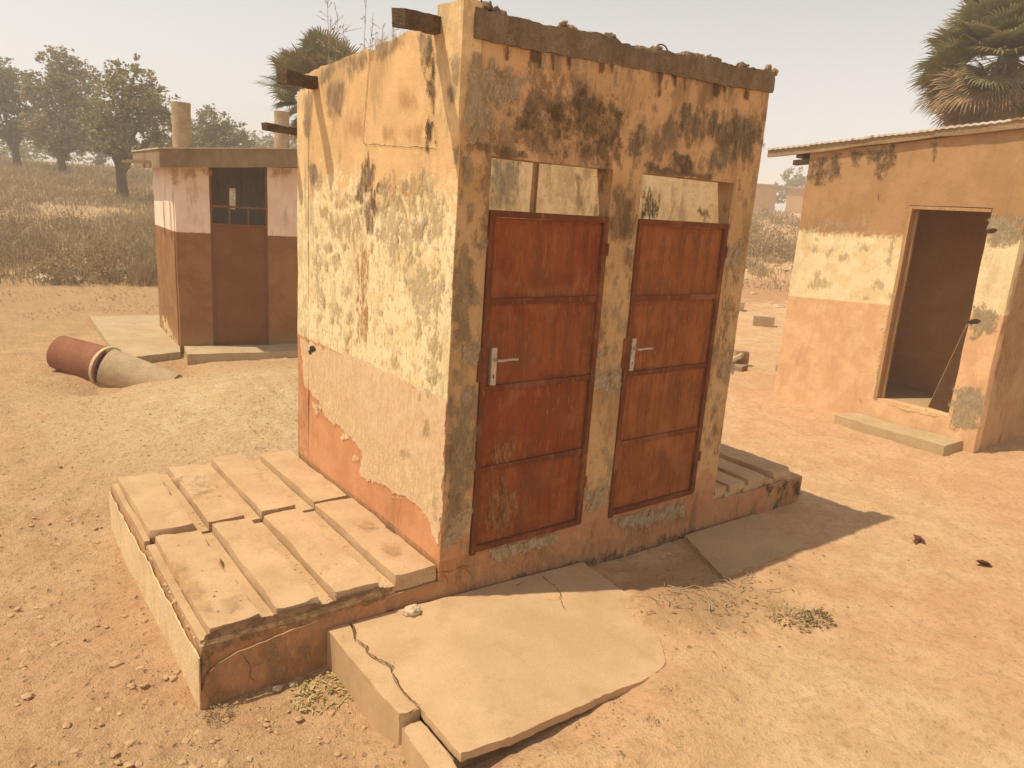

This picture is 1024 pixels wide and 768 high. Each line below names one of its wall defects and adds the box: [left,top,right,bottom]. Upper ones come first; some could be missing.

water stain [531,50,554,70]
water stain [307,163,317,187]
water stain [355,153,385,234]
water stain [477,56,765,205]
water stain [808,144,896,185]
peeling [300,168,489,553]
crack [352,624,418,722]